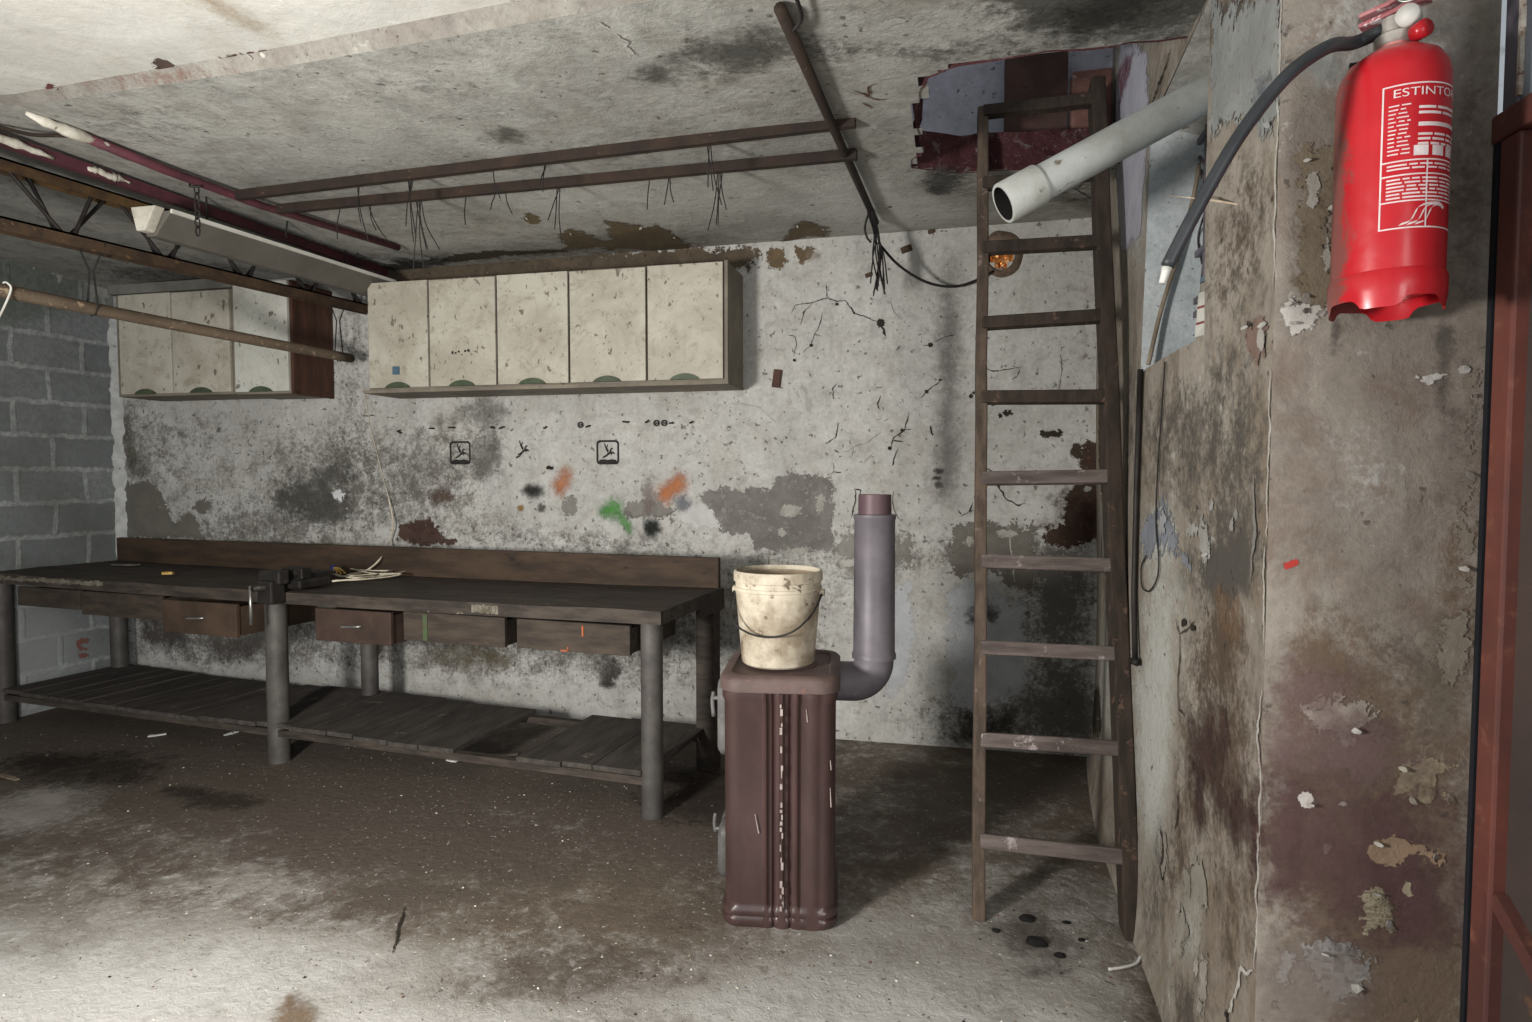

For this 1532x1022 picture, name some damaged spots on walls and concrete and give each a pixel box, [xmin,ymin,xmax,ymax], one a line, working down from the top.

leakage [270,463,354,521]
peeling [396,516,457,548]
peeling [623,470,854,646]
peeling [895,524,916,570]
leakage [951,711,1017,743]
peeling [1295,690,1384,748]
peeling [1297,791,1315,808]
peeling [1392,750,1460,806]
leakage [1186,671,1463,1005]
peeling [1358,834,1447,936]